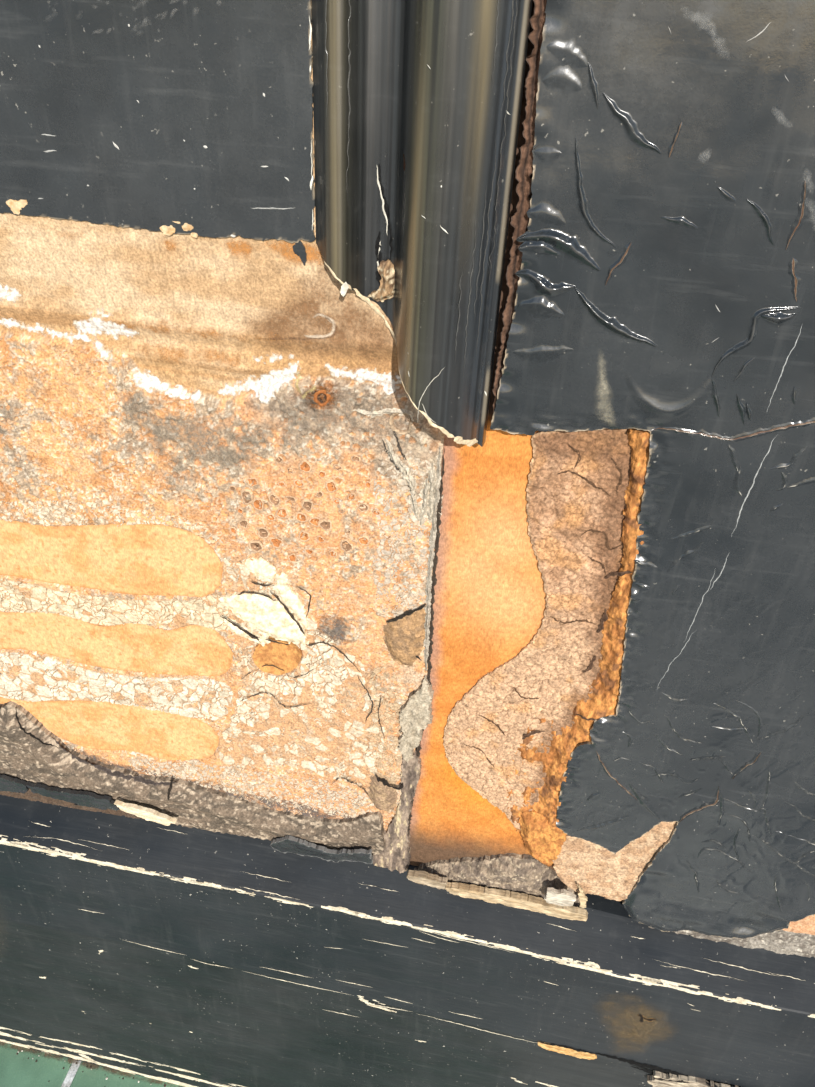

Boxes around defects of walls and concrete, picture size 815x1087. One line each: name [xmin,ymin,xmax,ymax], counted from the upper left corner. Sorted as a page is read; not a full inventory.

crack [492,0,547,413]
water stain [0,310,168,359]
water stain [218,354,299,404]
corrosion [296,373,337,410]
efflorescence [325,364,402,395]
crack [651,417,815,442]
crack [382,431,445,688]
peeling [0,499,402,818]
crack [241,630,385,739]
peeling [443,428,677,901]
spalling [0,823,800,1011]
spalling [0,1027,245,1087]